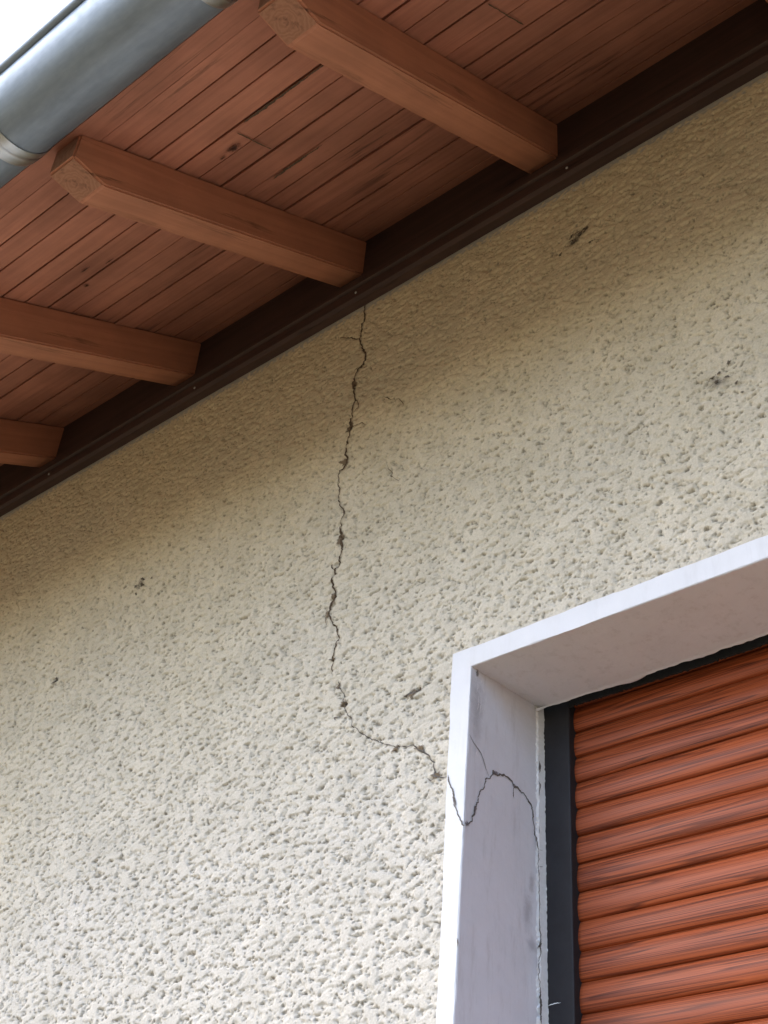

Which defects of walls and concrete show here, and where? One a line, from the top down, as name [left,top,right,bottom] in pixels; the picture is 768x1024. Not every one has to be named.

crack [325,303,543,1023]